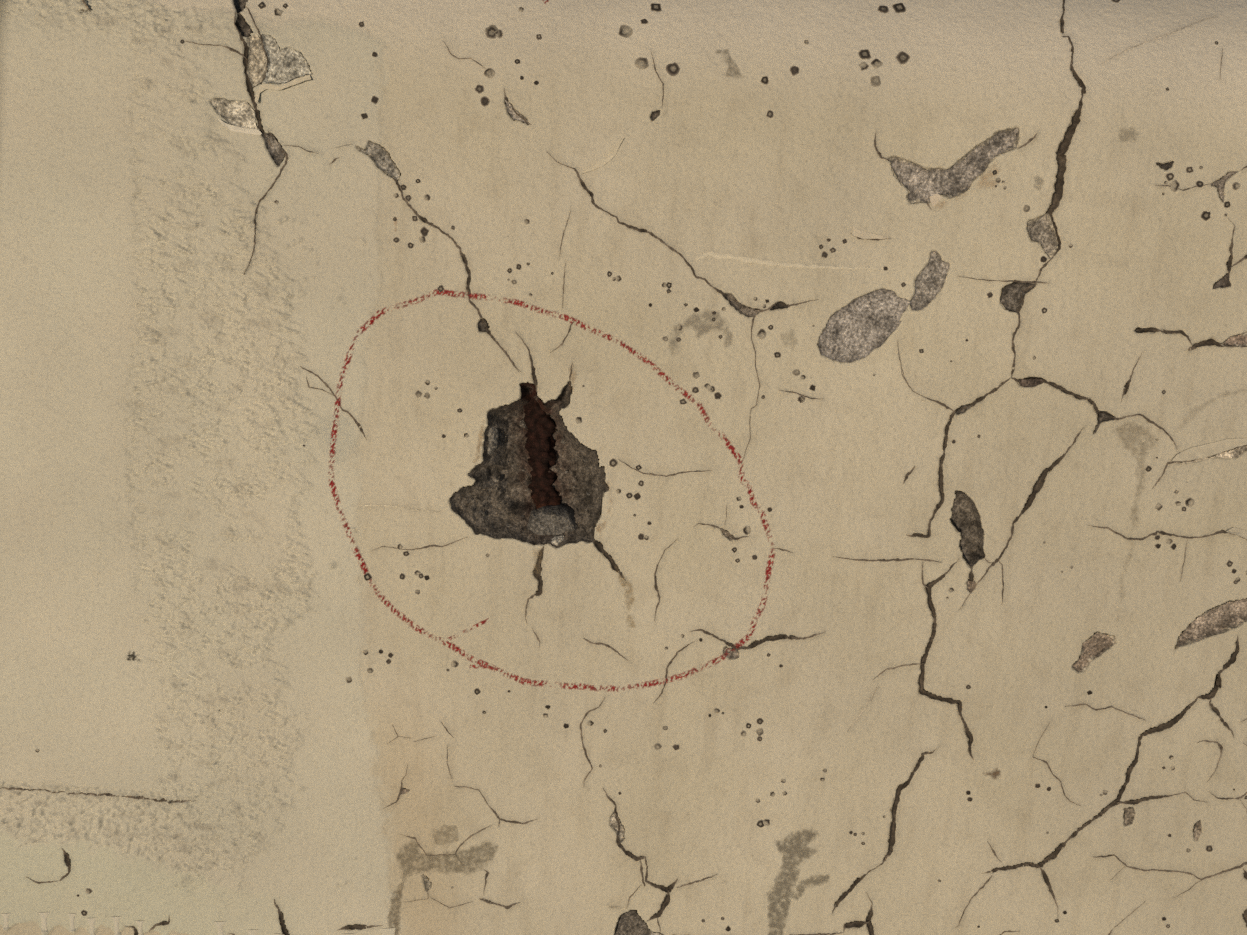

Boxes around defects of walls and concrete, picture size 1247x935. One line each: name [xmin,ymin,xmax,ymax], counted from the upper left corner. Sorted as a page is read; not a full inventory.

crack [186,0,519,372]
spalling [449,333,626,646]
crack [546,138,819,464]
spalling [818,250,950,363]
spalling [874,127,1037,210]
spalling [950,491,985,592]
crack [837,0,1247,760]
spalling [1175,599,1247,650]
spalling [614,910,661,935]
crack [580,697,717,935]
crack [790,749,936,935]
crack [955,635,1247,928]